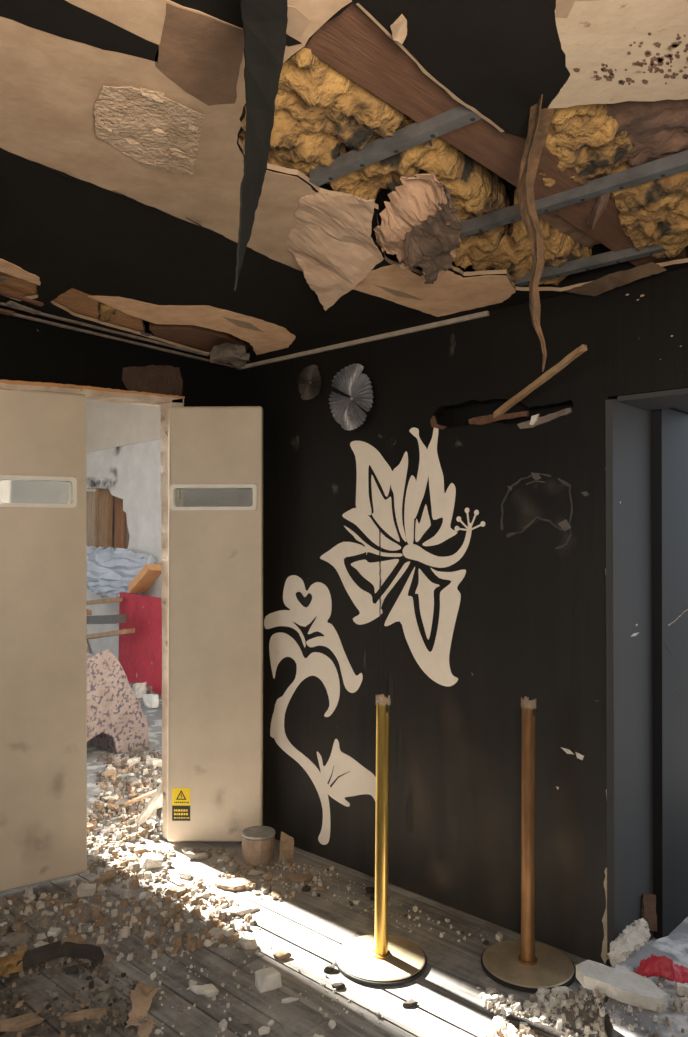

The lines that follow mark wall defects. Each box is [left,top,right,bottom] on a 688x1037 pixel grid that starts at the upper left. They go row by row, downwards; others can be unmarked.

peeling [283,0,352,63]
peeling [548,0,688,109]
peeling [0,0,316,272]
peeling [0,259,41,286]
spalling [468,408,572,429]